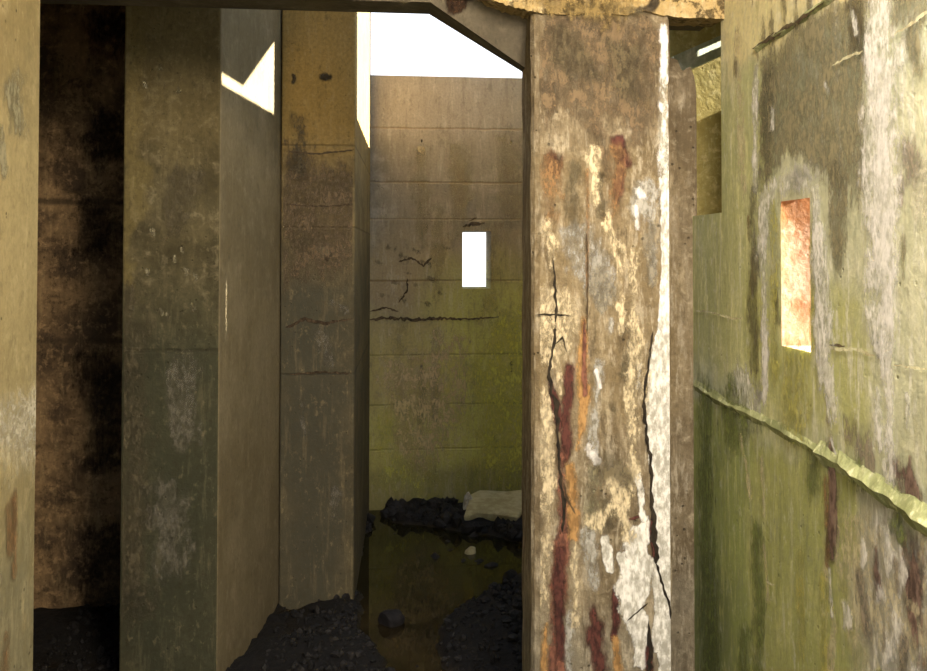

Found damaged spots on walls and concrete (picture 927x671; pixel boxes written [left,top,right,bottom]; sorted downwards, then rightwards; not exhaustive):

crack [286,148,352,156]
crack [285,257,499,328]
peeling [540,534,553,606]
peeling [540,288,577,523]
crack [537,234,589,532]
peeling [544,221,583,264]
corrosion [540,319,590,671]
corrosion [586,588,622,671]
peeling [568,24,671,671]
crack [627,333,672,671]
damp [733,0,927,501]
corrosion [824,467,839,567]